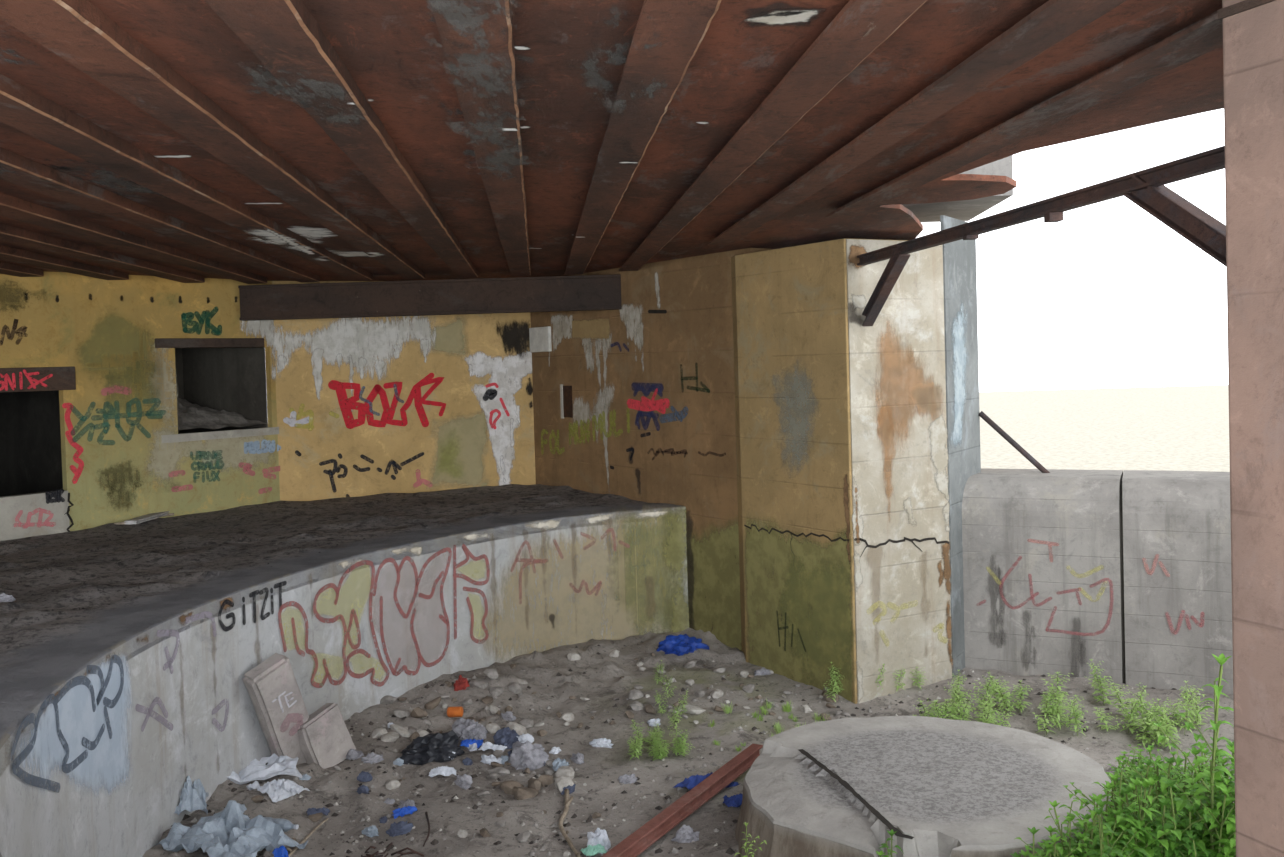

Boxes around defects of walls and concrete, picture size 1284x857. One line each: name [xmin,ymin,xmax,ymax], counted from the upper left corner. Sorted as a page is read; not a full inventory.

rust [877,332,938,497]
crack [744,524,949,566]